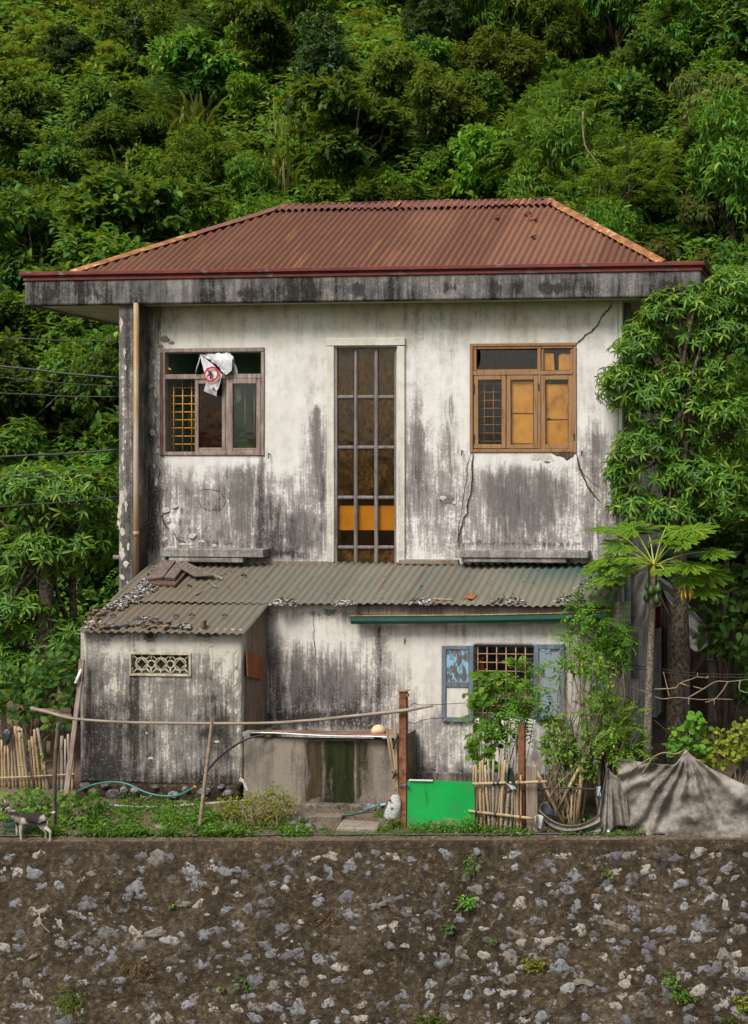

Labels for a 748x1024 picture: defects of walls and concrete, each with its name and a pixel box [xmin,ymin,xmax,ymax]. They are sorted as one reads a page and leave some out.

water stain [538,283,592,295]
crack [577,302,614,344]
water stain [226,469,262,531]
water stain [312,405,323,498]
water stain [415,423,424,485]
crack [456,454,474,550]
water stain [488,467,566,544]
crack [576,455,601,503]
water stain [277,656,381,722]
water stain [201,708,227,739]